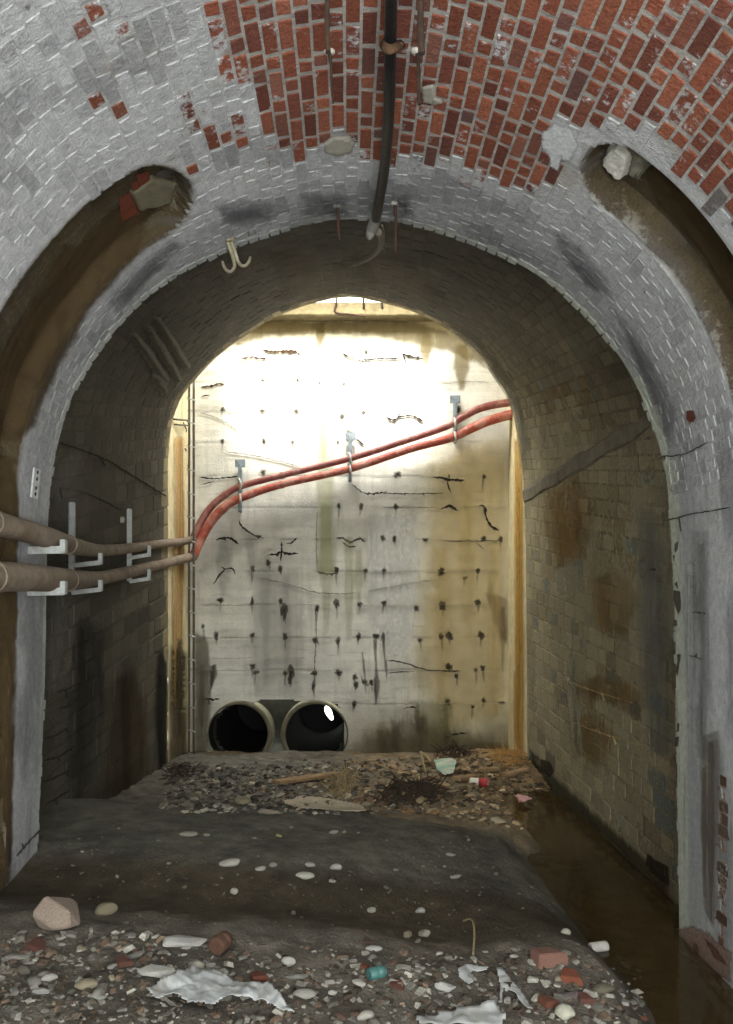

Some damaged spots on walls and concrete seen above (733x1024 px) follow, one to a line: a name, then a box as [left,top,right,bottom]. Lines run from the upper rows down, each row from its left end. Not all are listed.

spalling [119,171,150,223]
crack [240,349,300,360]
damp [316,323,324,346]
crack [342,353,489,383]
damp [421,332,431,363]
crack [183,383,299,485]
crack [385,413,424,422]
damp [455,337,525,462]
crack [200,475,503,693]
damp [362,640,387,702]
spalling [679,926,732,981]